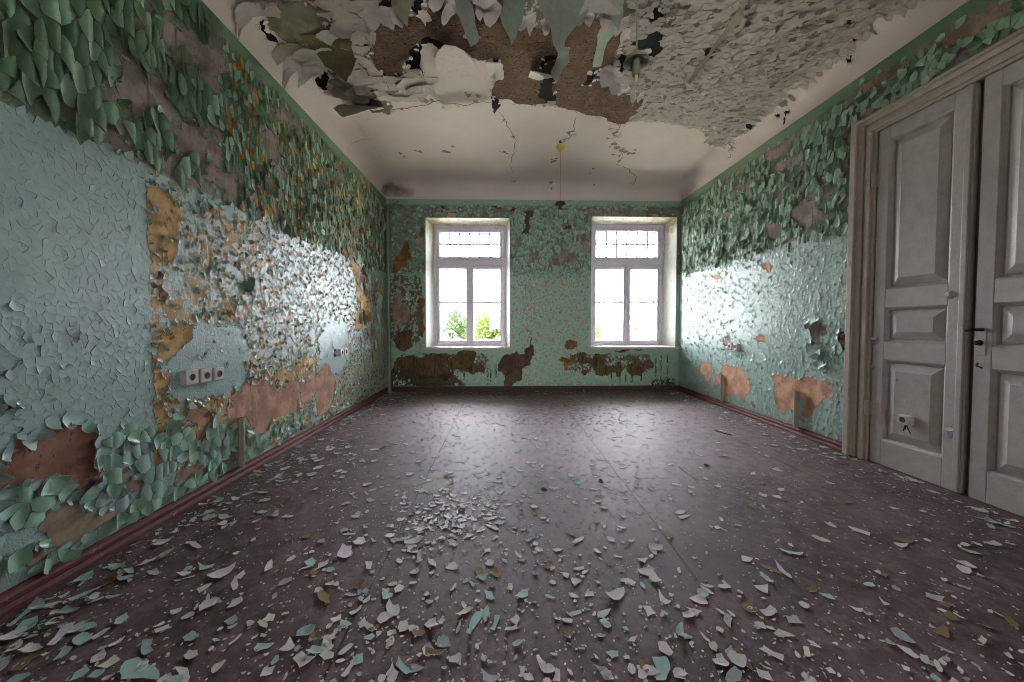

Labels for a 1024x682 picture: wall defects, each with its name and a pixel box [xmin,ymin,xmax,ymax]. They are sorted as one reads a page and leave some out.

crack [383,100,519,168]
peeling [0,0,927,575]
peeling [681,0,1024,440]